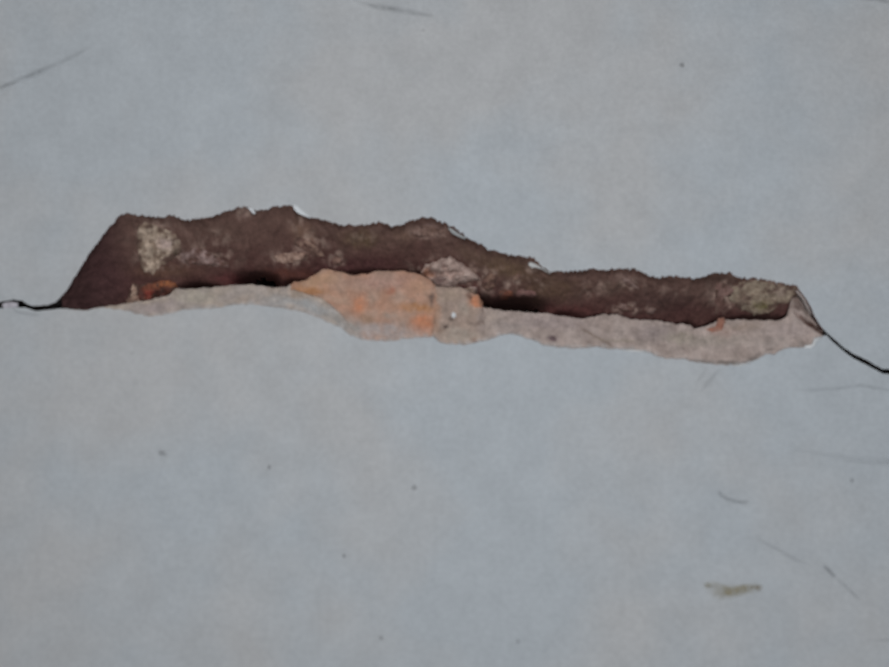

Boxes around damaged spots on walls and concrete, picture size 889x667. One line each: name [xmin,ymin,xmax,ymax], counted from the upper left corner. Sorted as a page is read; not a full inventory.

crack [0,297,64,311]
flaking render [61,205,824,366]
crack [822,330,889,374]